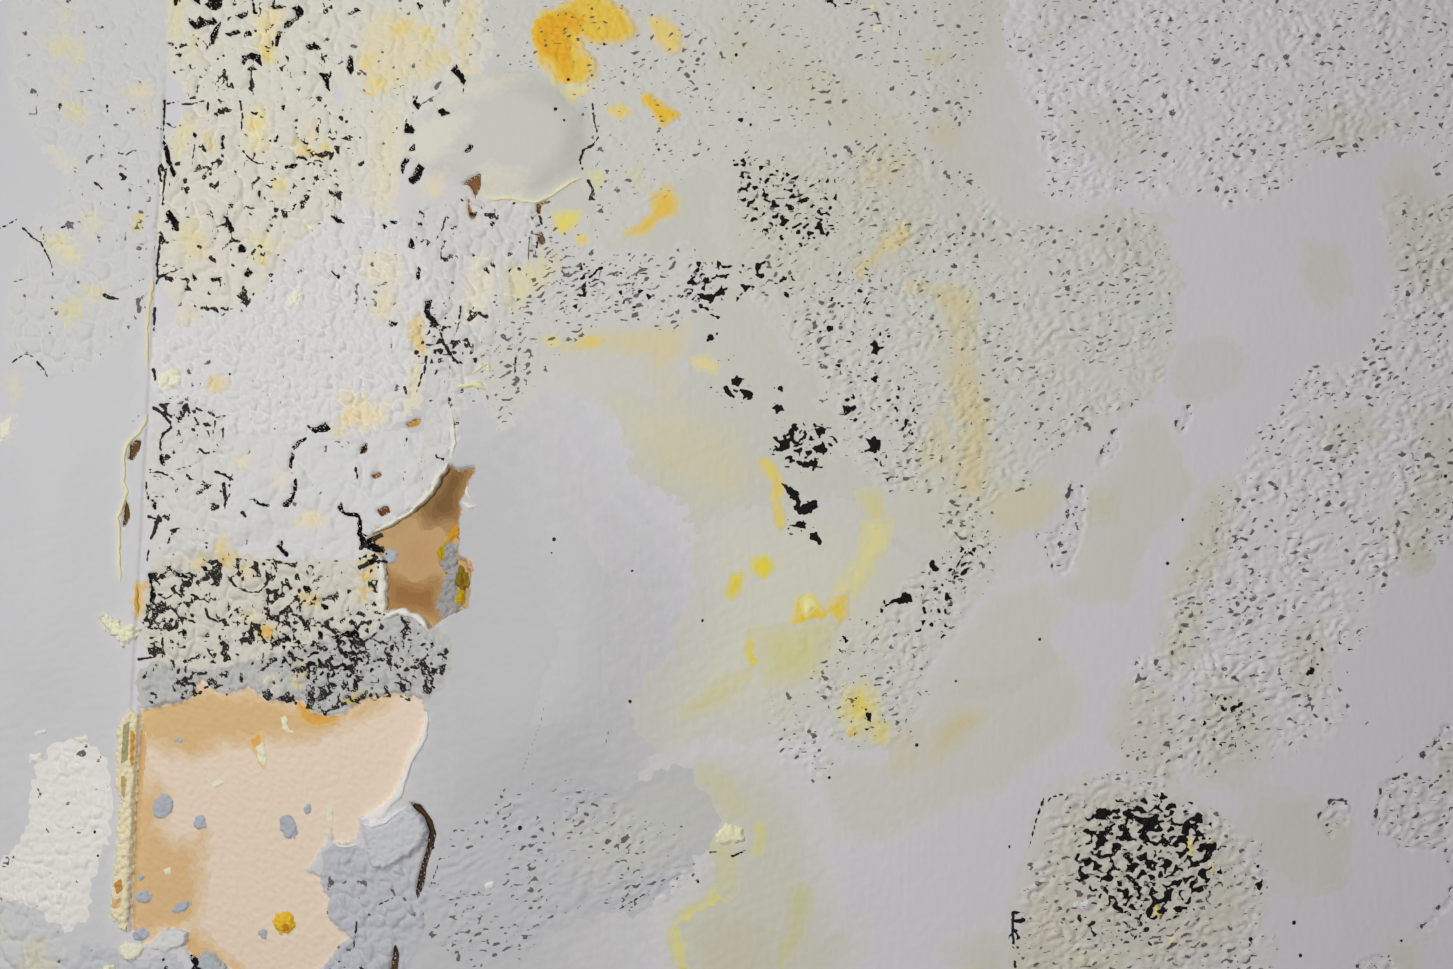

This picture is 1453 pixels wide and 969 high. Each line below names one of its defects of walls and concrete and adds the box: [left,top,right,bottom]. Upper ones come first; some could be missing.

damp [0,0,410,969]
peeling [375,562,432,634]
peeling [375,463,448,532]
damp [237,0,1357,969]
peeling [103,709,227,969]
peeling [332,712,429,873]
peeling [1317,798,1352,833]
peeling [1373,724,1453,931]